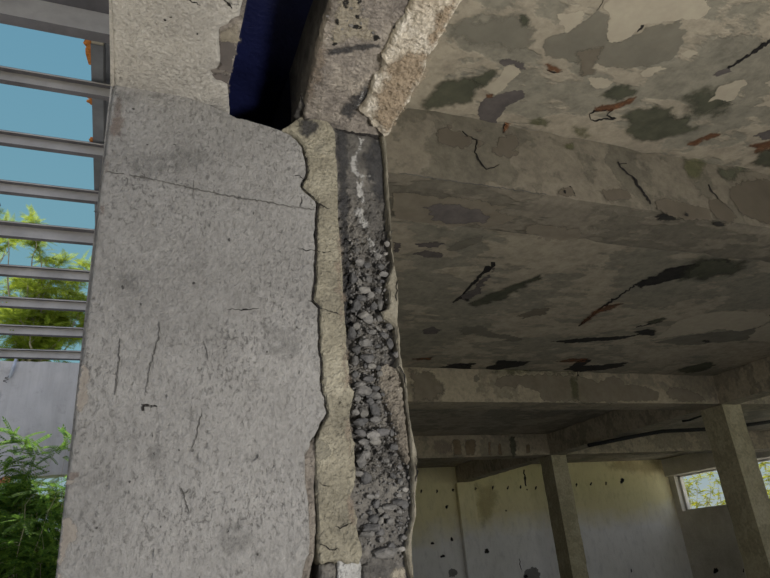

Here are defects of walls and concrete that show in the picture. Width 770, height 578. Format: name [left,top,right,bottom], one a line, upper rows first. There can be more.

corrosion [83,40,91,65]
crack [714,40,770,77]
spalling [436,59,526,149]
corrosion [589,97,636,122]
peeling [709,79,748,102]
crack [400,131,546,195]
crack [618,161,651,204]
corrosion [687,133,721,146]
peeling [656,178,770,225]
corrosion [750,130,770,167]
crack [107,157,340,422]
flaking render [347,241,409,560]